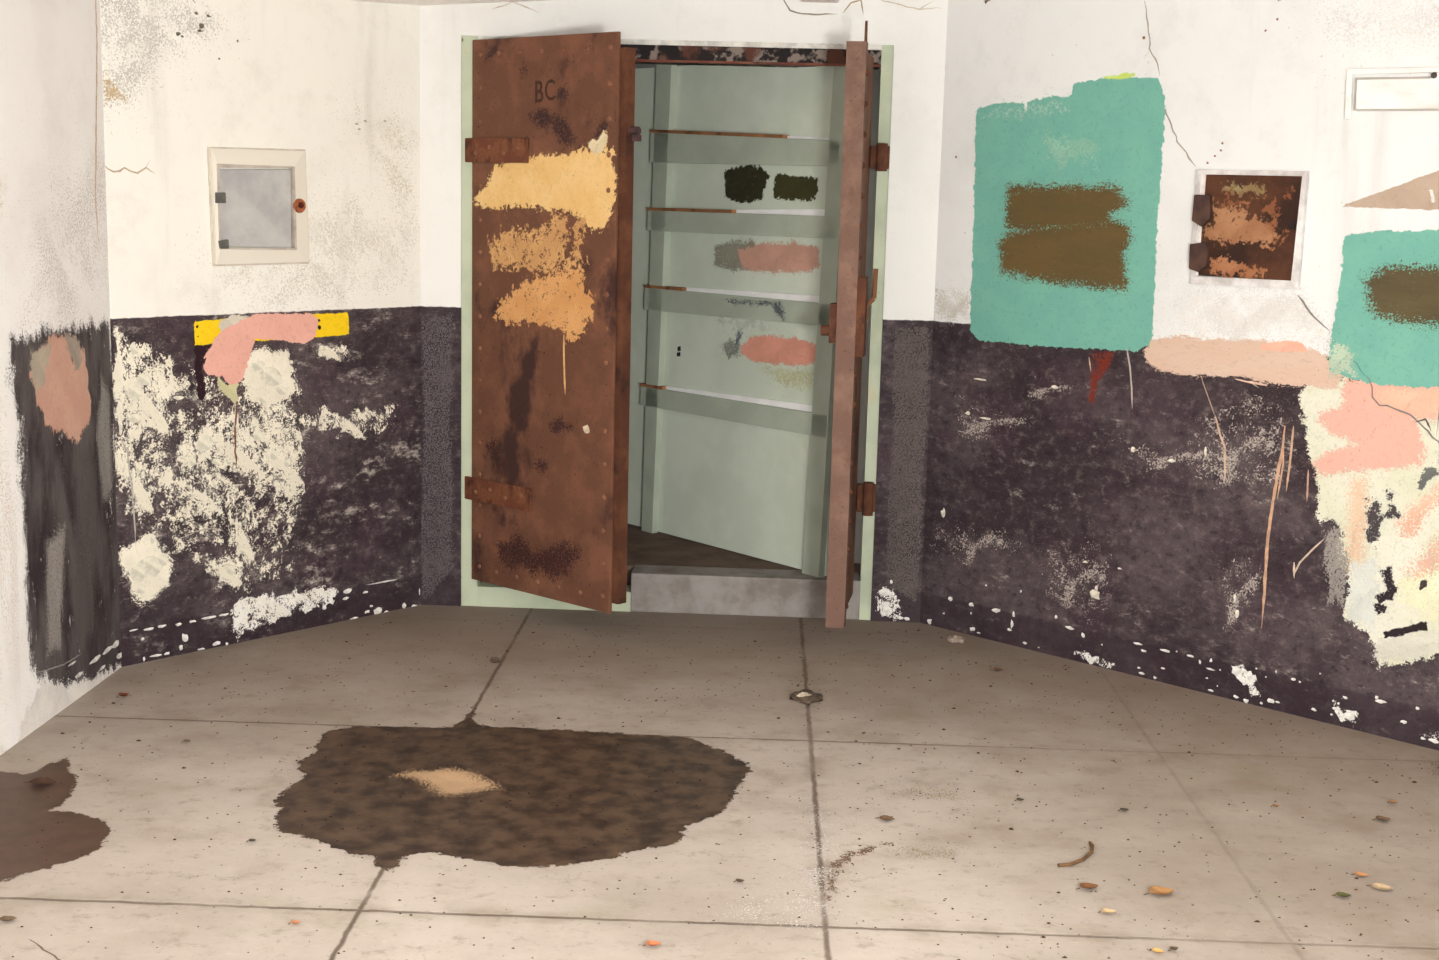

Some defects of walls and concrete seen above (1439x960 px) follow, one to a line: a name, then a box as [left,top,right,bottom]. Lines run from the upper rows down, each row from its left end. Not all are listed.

crack [1144,1,1160,75]
crack [1165,110,1194,164]
damp [0,758,111,882]
damp [273,711,753,873]